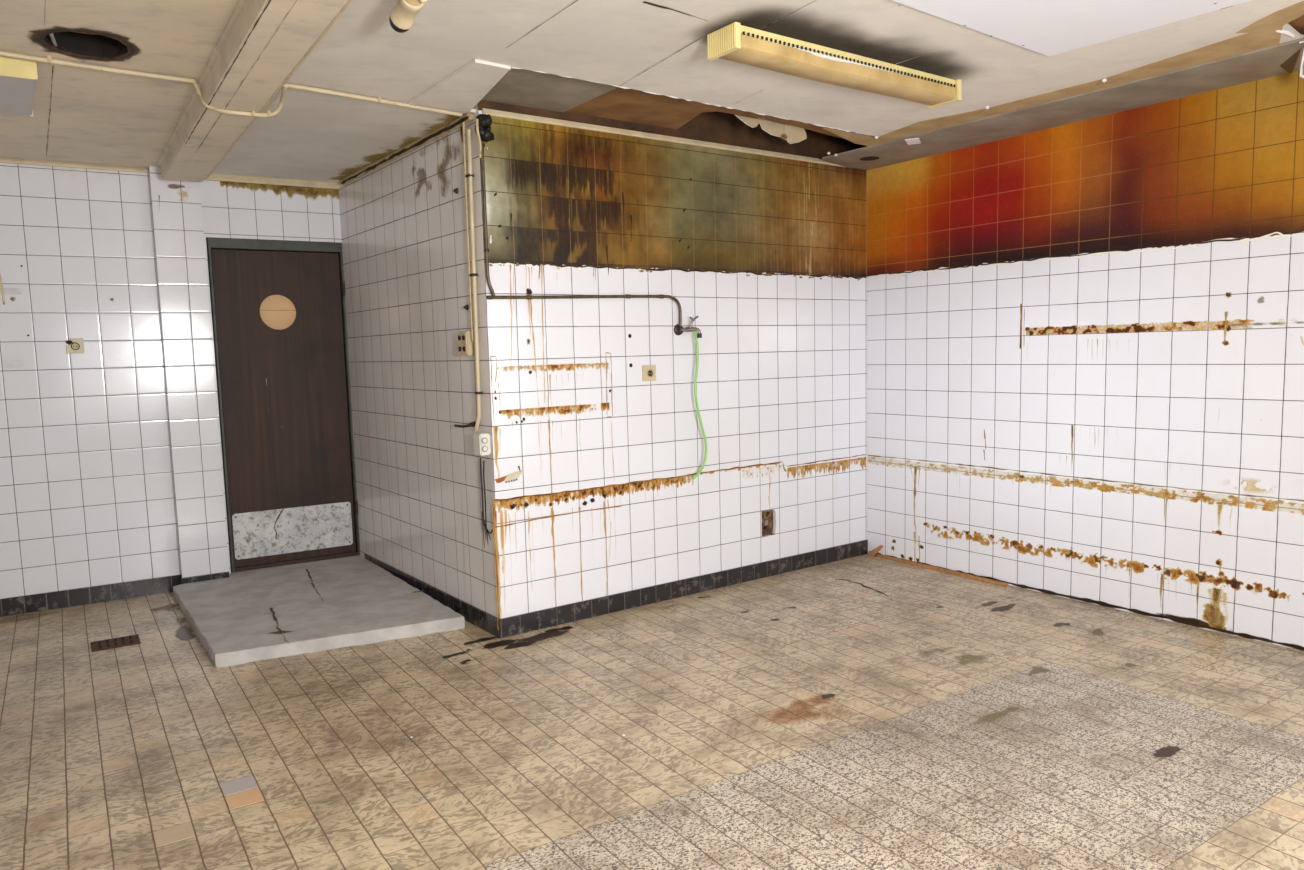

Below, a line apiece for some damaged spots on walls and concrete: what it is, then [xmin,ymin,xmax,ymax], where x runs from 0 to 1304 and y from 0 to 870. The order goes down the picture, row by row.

peeling [511,1,1304,146]
rust [490,262,613,468]
rust [1019,292,1281,349]
rust [493,425,1304,633]